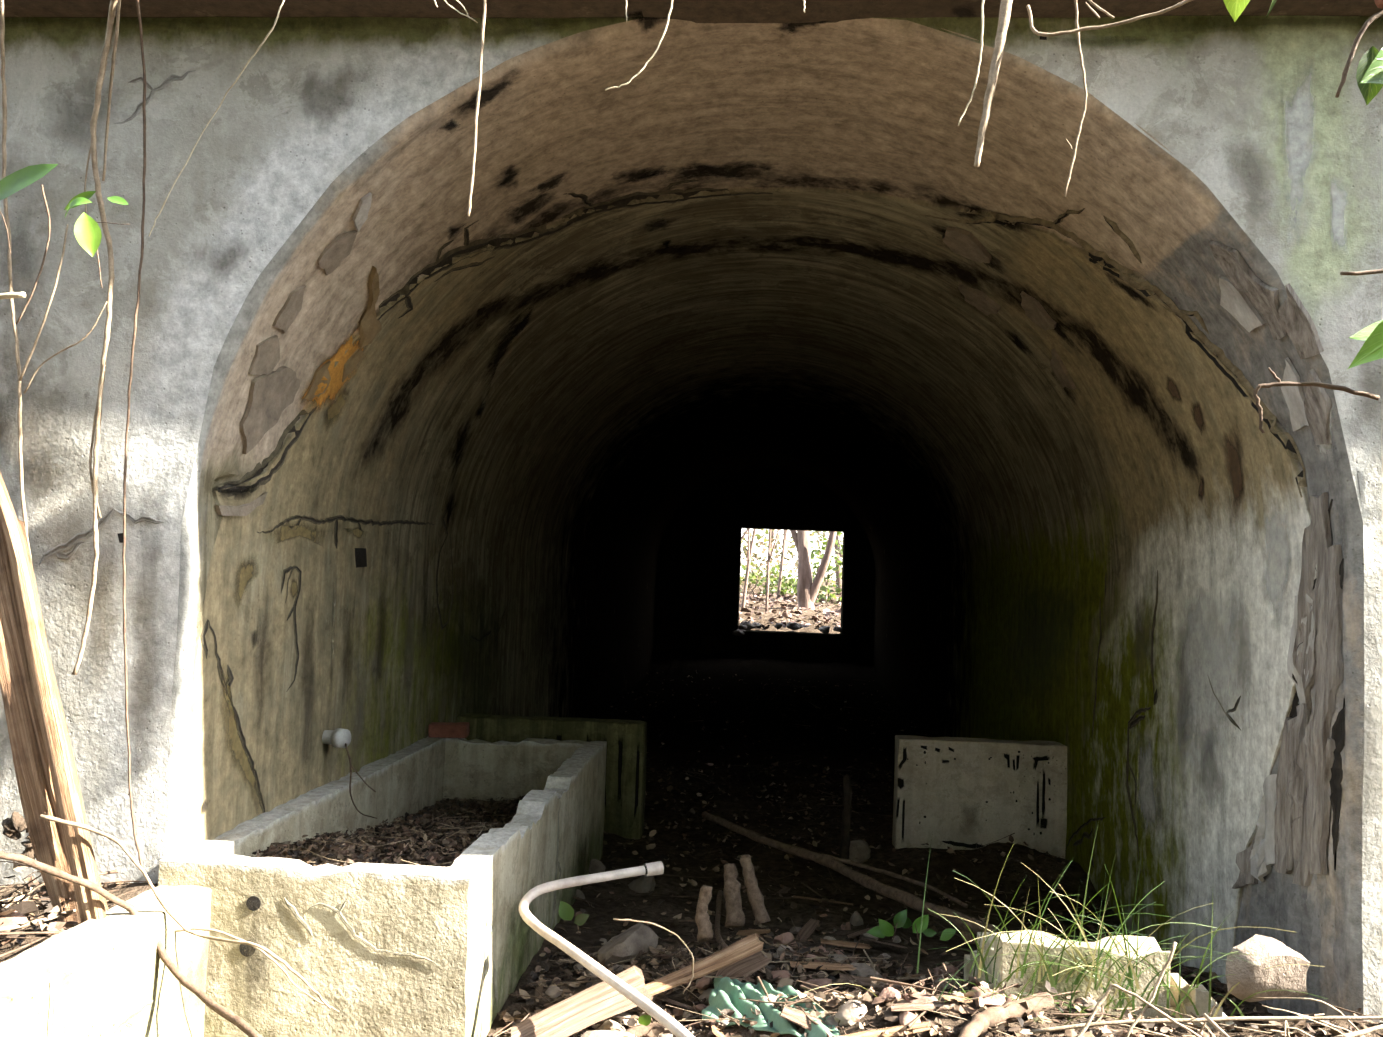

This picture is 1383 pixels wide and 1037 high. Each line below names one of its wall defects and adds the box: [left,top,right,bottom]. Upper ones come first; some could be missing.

flaking render [317,192,372,275]
crack [377,179,773,320]
flaking render [239,285,306,454]
corrosion [302,266,382,425]
crack [215,407,317,493]
crack [257,515,434,549]
crack [200,619,265,813]
crack [281,566,302,692]
water stain [1139,745,1155,823]
water stain [1178,603,1231,758]
crack [1289,642,1303,718]
crack [1329,698,1345,872]